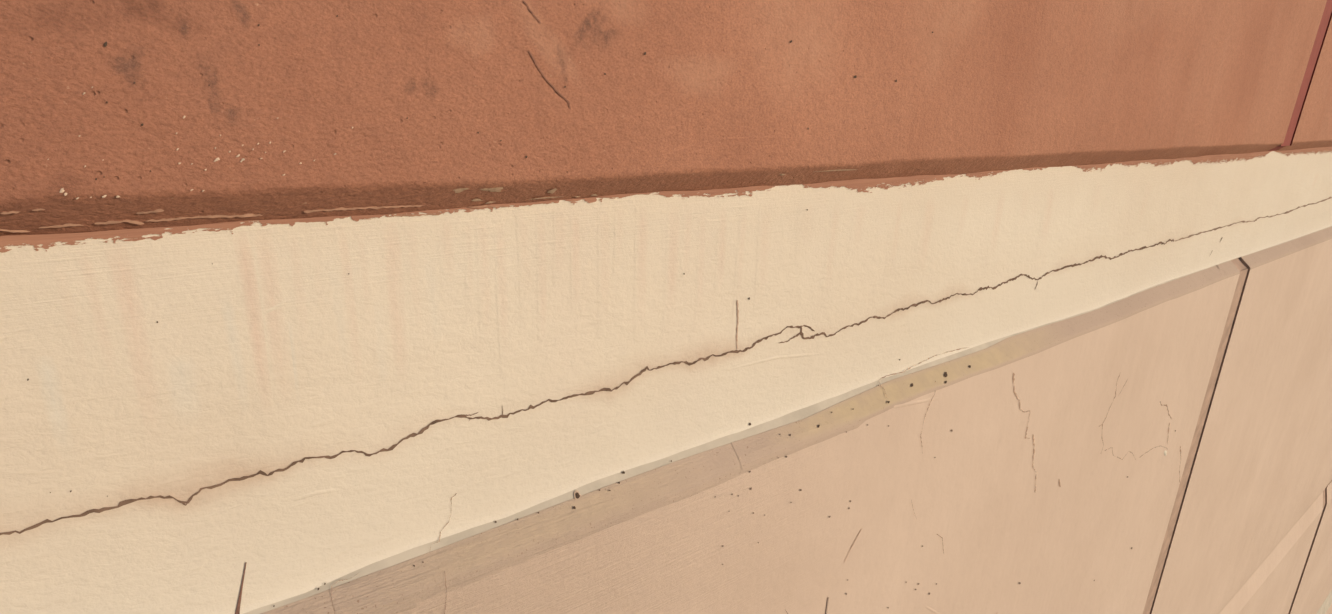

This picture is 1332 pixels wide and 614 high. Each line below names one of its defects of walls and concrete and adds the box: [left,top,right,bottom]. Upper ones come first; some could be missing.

crack [0,197,1332,535]